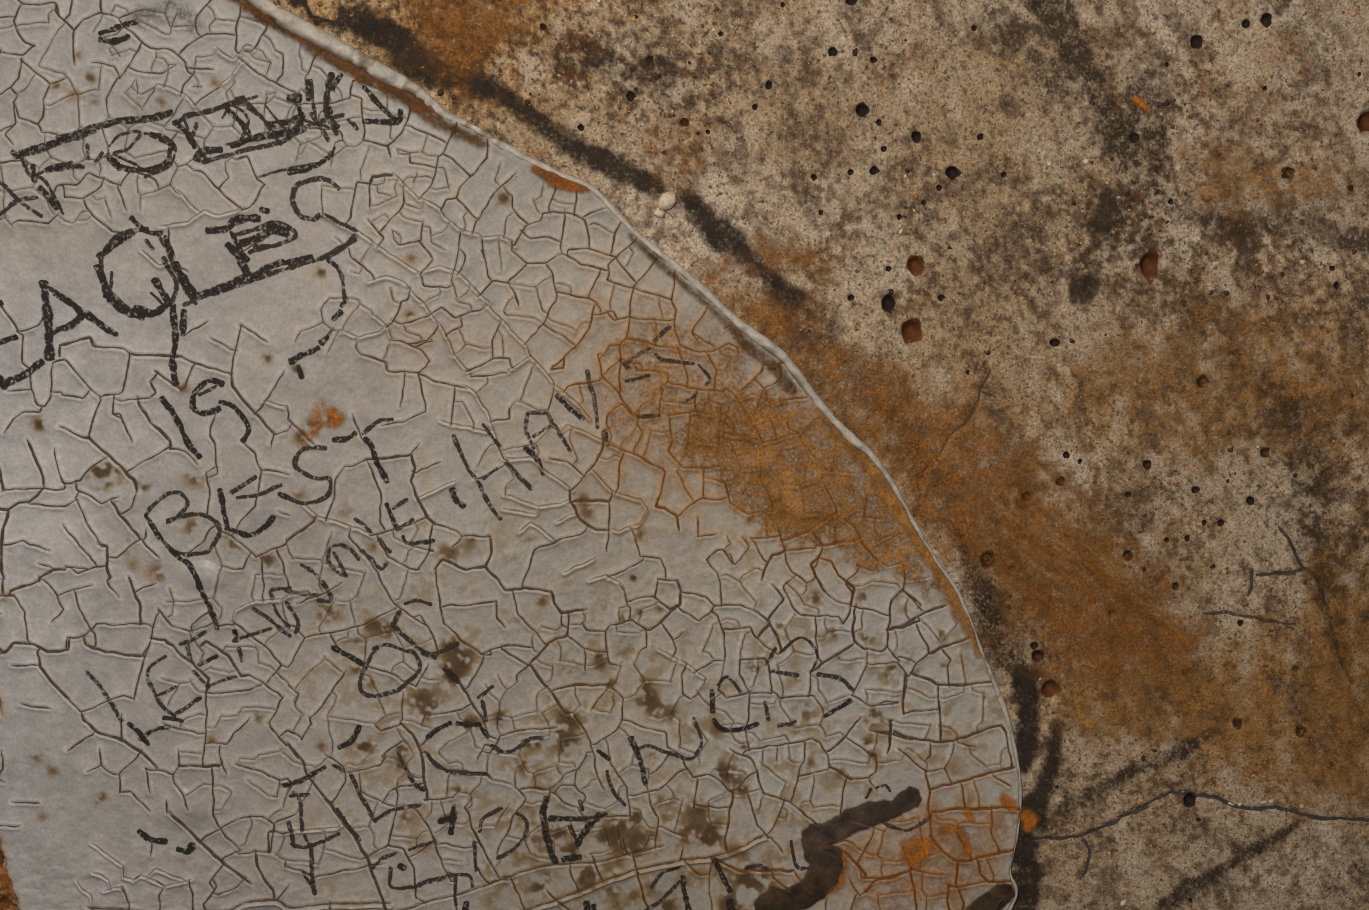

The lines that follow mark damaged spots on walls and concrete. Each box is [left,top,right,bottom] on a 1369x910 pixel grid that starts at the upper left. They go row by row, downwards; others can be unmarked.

leakage [290,0,832,356]
crack [0,0,1020,910]
peeling [0,0,1022,910]
leakage [630,234,796,394]
corrosion [605,322,981,658]
corrosion [1118,305,1369,466]
leakage [949,521,1216,910]
corrosion [902,809,974,868]
corrosion [1001,795,1038,832]
crack [1031,791,1369,880]
leakage [1156,824,1295,910]